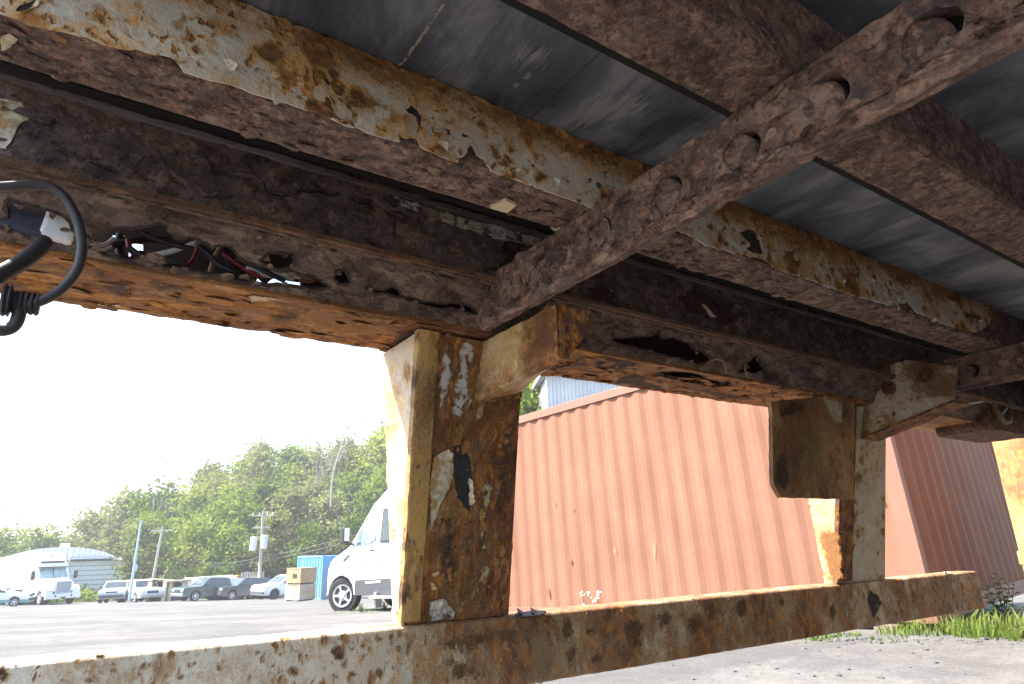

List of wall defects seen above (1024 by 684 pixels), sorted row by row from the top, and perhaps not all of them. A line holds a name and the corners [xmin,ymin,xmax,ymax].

peeling [403,106,475,146]
corrosion [390,328,417,346]
peeling [438,353,452,423]
corrosion [442,304,555,576]
peeling [429,450,454,527]
corrosion [439,518,471,593]
corrosion [736,599,746,617]
corrosion [868,590,882,618]
corrosion [0,664,10,682]
corrosion [323,645,356,678]
corrosion [439,607,546,680]
corrosion [550,617,595,663]